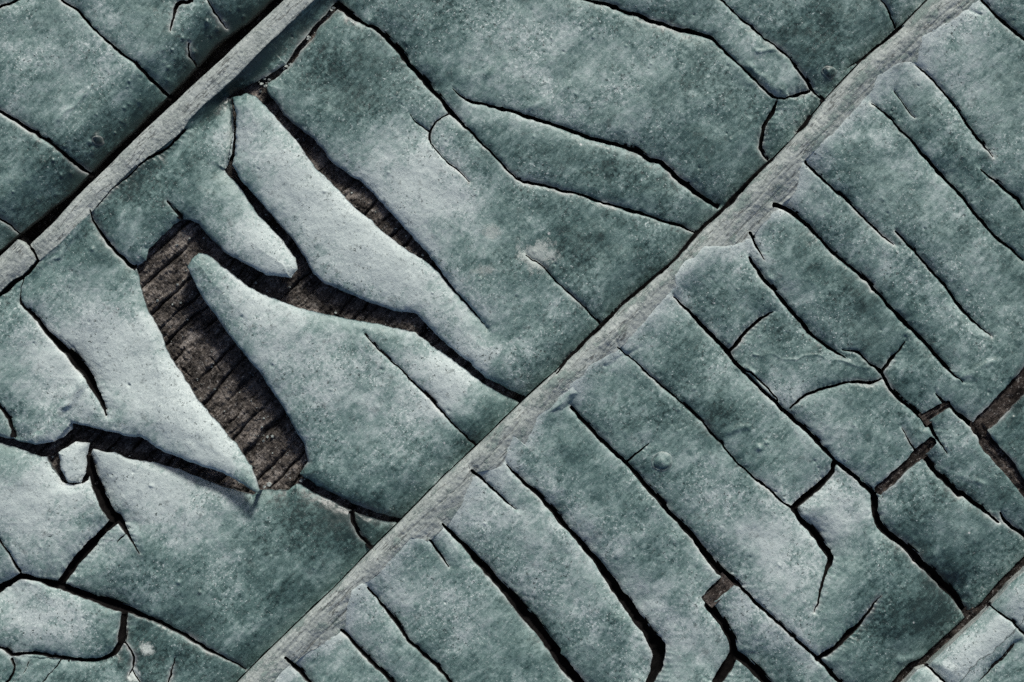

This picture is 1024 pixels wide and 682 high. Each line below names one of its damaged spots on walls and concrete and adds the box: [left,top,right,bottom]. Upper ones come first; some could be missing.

crack [0,110,185,270]
peeling [0,3,533,659]
crack [334,0,825,374]
crack [804,161,991,336]
crack [871,91,1022,260]
crack [916,66,1024,211]
crack [0,455,246,682]
crack [340,629,396,682]
crack [429,524,584,682]
crack [471,464,666,682]
crack [569,405,881,682]
crack [618,202,1024,682]